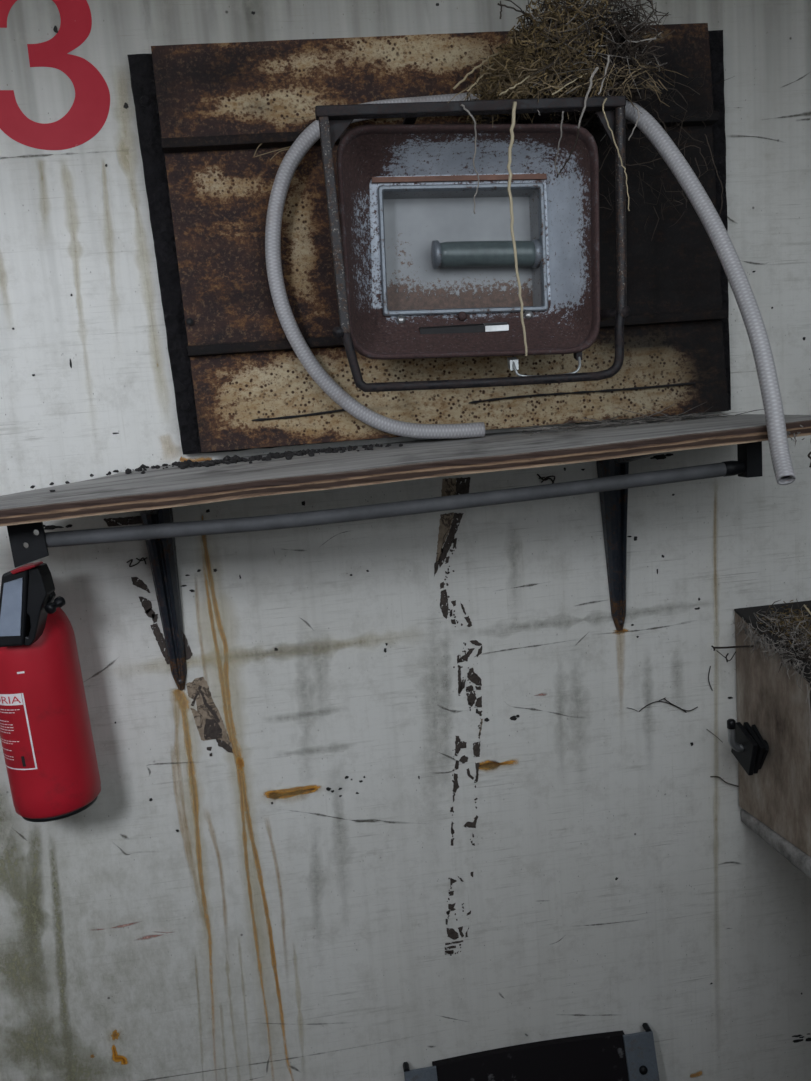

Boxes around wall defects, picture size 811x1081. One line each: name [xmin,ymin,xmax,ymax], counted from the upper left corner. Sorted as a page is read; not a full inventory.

peeling [441,477,470,496]
peeling [434,512,472,627]
corrosion [174,689,212,965]
peeling [186,677,233,756]
corrosion [202,535,288,1063]
corrosion [265,785,320,799]
peeling [450,640,490,846]
corrosion [479,760,515,770]
water stain [0,835,101,1081]
peeling [445,872,473,955]